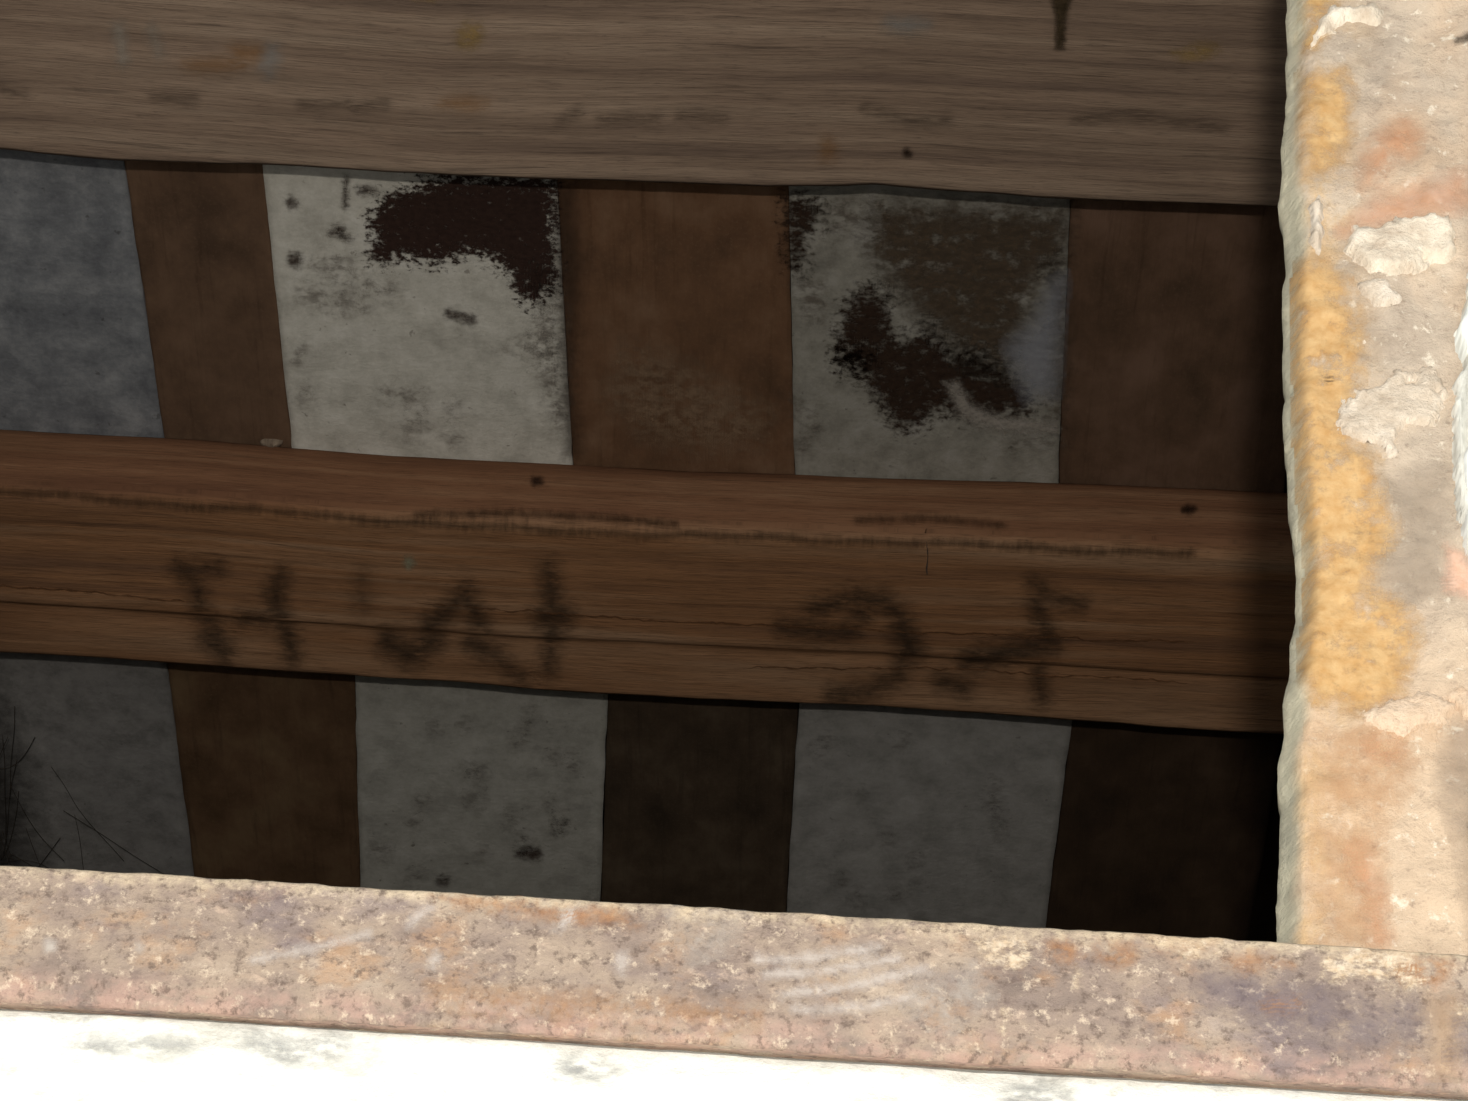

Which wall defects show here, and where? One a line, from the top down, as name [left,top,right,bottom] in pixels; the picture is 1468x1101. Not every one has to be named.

damp [330,174,568,385]
damp [774,188,1068,435]
damp [0,764,22,866]